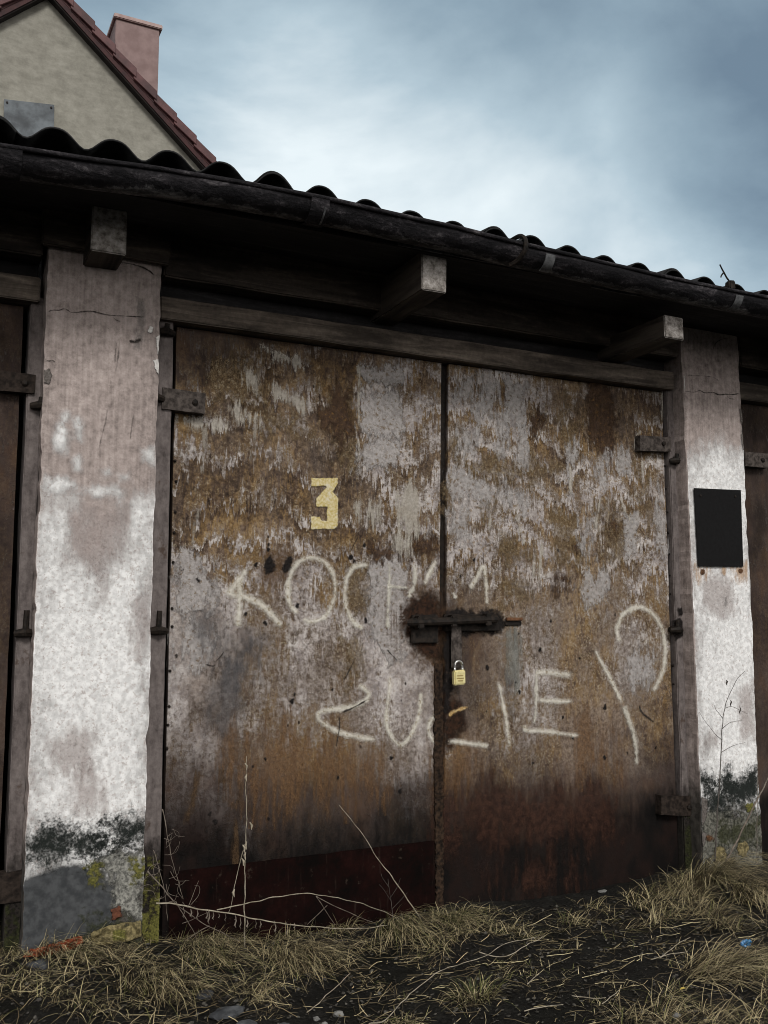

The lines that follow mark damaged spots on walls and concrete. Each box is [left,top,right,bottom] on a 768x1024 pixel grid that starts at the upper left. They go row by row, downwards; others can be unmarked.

crack [49,308,140,321]
peeling [175,400,261,432]
peeling [272,380,305,415]
peeling [349,360,409,474]
peeling [445,374,530,545]
peeling [364,480,426,668]
peeling [575,515,610,610]
peeling [624,511,641,564]
peeling [650,481,669,559]
leakage [684,763,763,871]
leakage [3,809,161,956]
spalling [23,906,142,957]